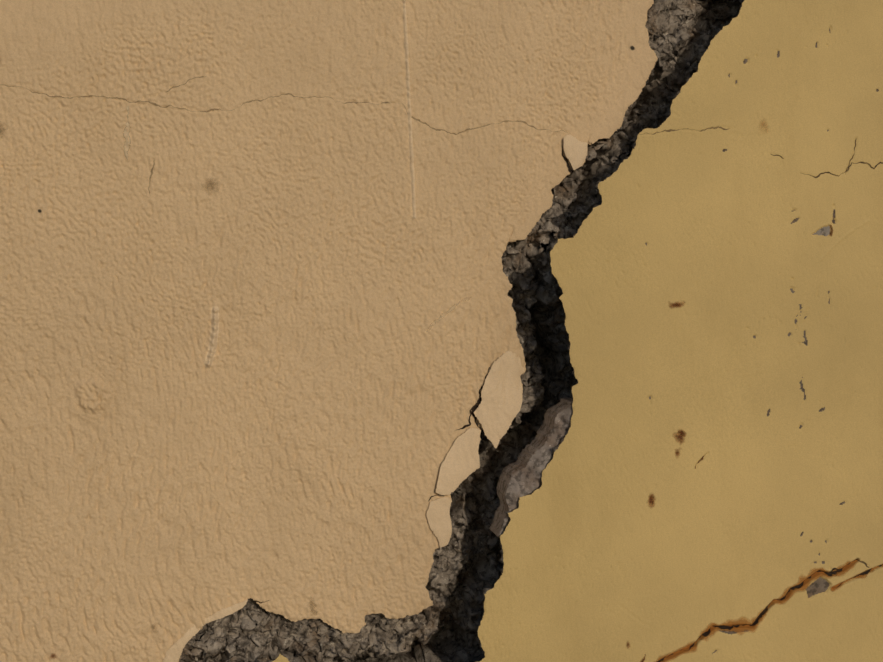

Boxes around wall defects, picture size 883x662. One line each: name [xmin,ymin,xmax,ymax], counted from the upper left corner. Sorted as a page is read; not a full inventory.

crack [804,140,883,178]
crack [163,0,744,662]
crack [657,559,883,662]